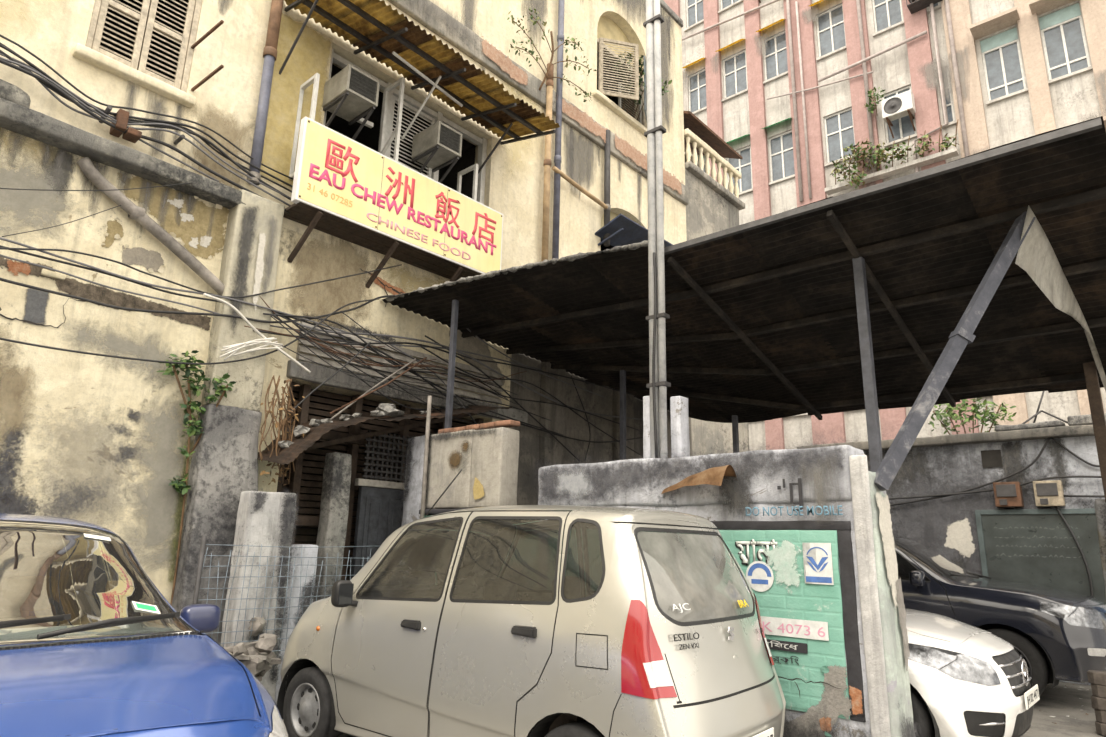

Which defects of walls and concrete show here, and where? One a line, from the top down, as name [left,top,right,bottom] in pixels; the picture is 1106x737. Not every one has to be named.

spalling [0,257,211,331]
peeling [102,220,166,274]
peeling [117,172,229,259]
water stain [230,207,257,333]
water stain [264,218,275,292]
water stain [0,334,106,517]
water stain [538,443,843,515]
water stain [890,449,930,492]
peeling [762,540,802,594]
peeling [944,518,976,558]
spalling [784,665,863,737]